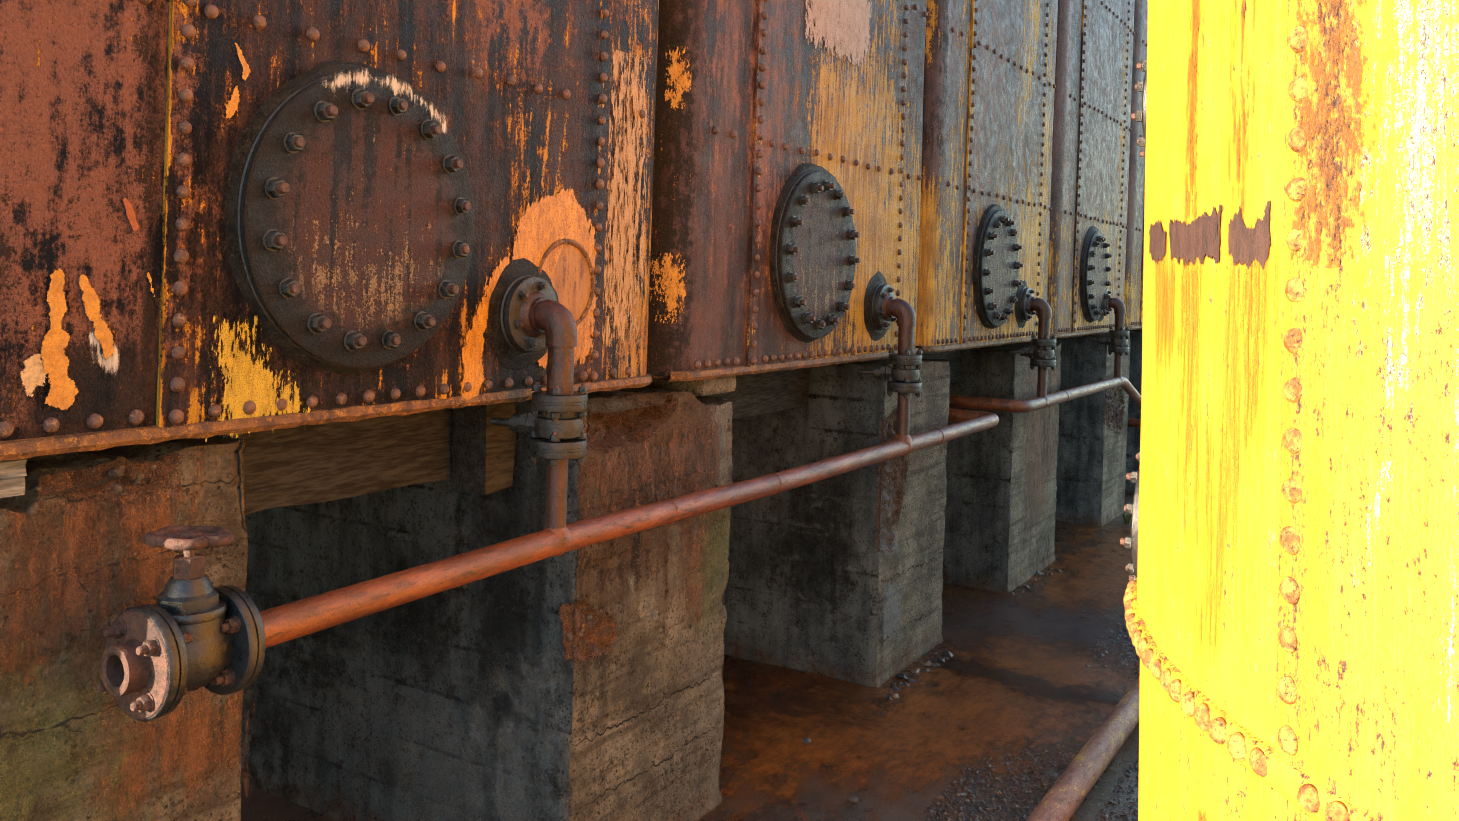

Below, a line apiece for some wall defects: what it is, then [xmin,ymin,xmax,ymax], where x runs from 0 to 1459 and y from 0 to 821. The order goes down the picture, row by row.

peeling [20,269,118,410]
rust [1154,0,1376,659]
rust [720,527,1140,810]